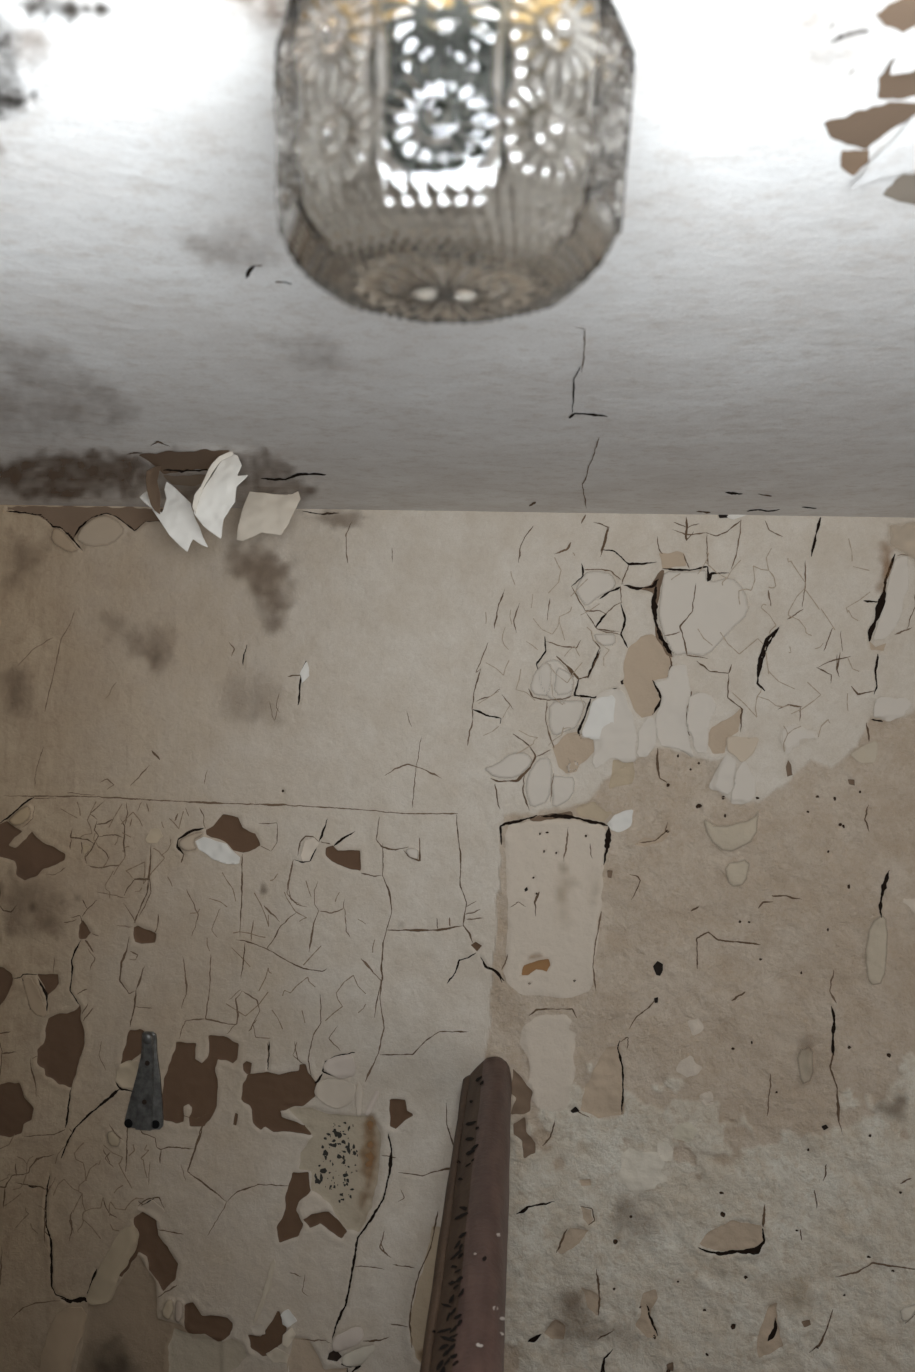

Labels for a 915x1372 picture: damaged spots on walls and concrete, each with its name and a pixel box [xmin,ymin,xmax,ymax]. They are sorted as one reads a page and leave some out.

mould [0,84,24,105]
mould [26,0,108,19]
spalling [824,48,915,205]
spalling [876,0,915,33]
water stain [0,452,135,498]
peeling [7,449,301,552]
crack [467,327,821,1018]
spalling [552,626,759,817]
crack [818,554,915,740]
crack [0,713,539,1319]
spalling [162,1035,413,1242]
crack [698,1205,766,1256]